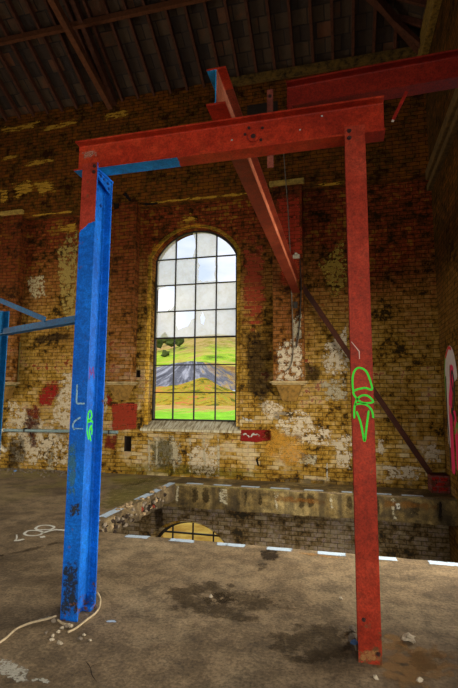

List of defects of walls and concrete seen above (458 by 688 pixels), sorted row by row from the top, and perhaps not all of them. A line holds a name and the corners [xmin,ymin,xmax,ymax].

peeling [24,380,61,447]
leakage [246,318,352,469]
flaking render [240,429,309,465]
spalling [99,486,167,533]
leakage [192,488,210,503]
leakage [299,493,315,508]
rust [61,562,78,616]